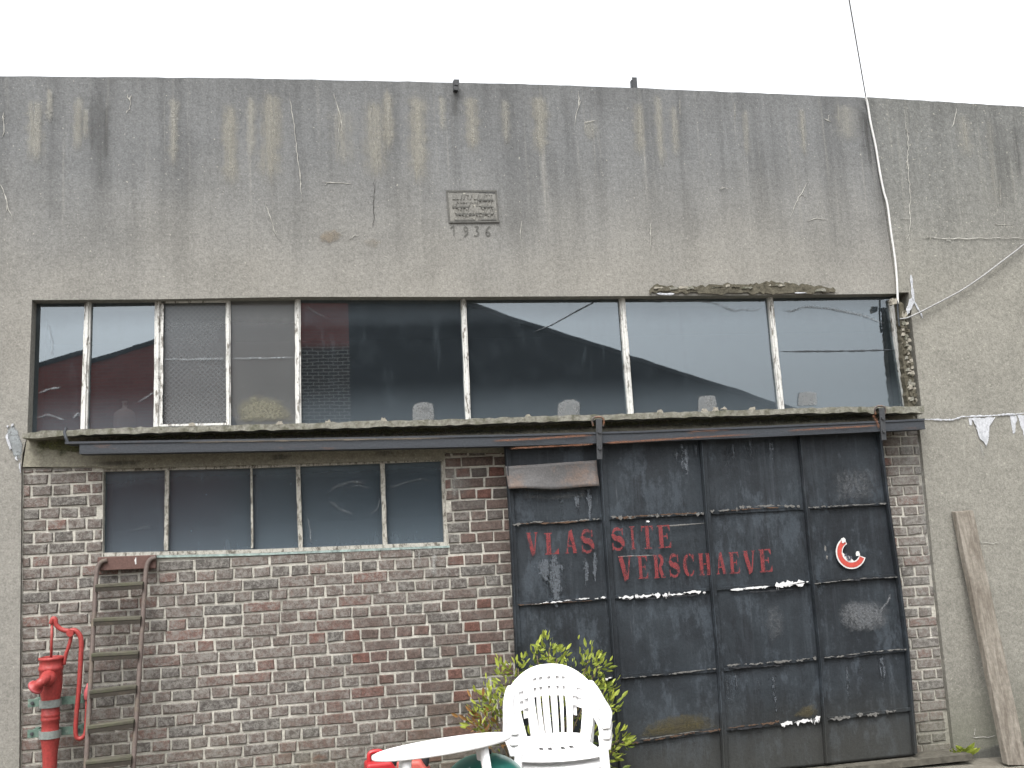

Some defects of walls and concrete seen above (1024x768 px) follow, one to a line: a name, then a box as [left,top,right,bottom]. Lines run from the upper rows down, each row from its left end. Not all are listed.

crack [289,92,375,238]
crack [904,110,1024,249]
spalling [649,281,836,295]
peeling [889,275,923,405]
peeling [619,590,706,600]
peeling [632,710,896,744]